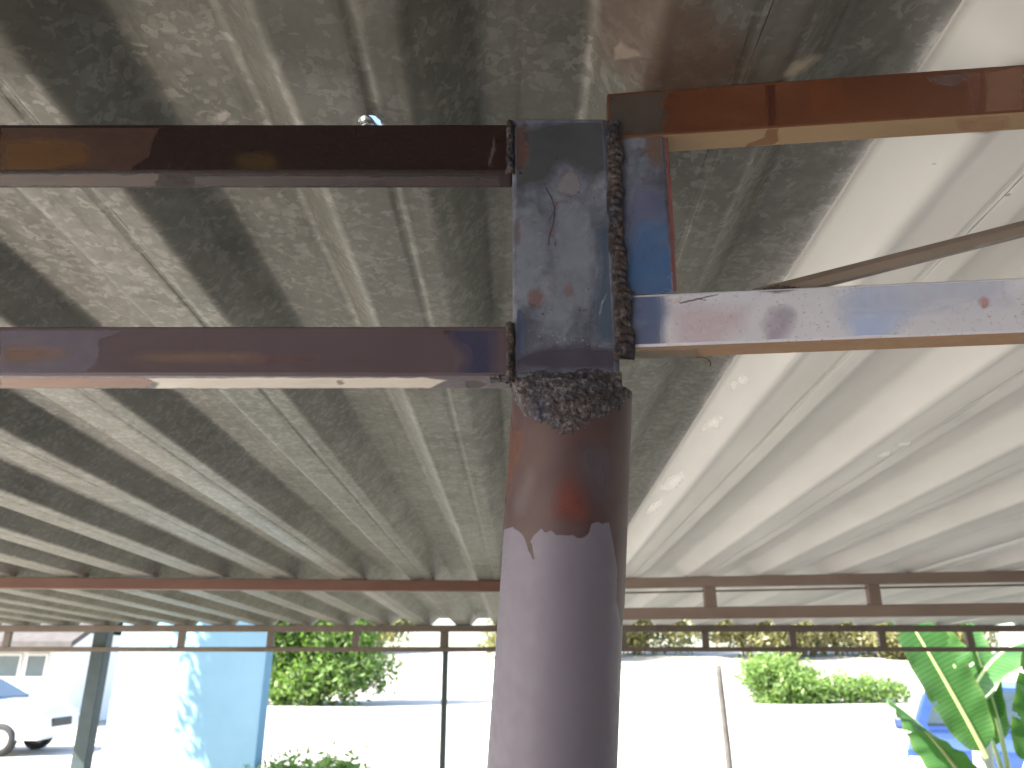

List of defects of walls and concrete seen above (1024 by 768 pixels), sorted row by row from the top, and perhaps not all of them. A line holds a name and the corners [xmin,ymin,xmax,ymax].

corrosion [959,118,1006,133]
crack [546,188,556,245]
corrosion [503,397,632,625]